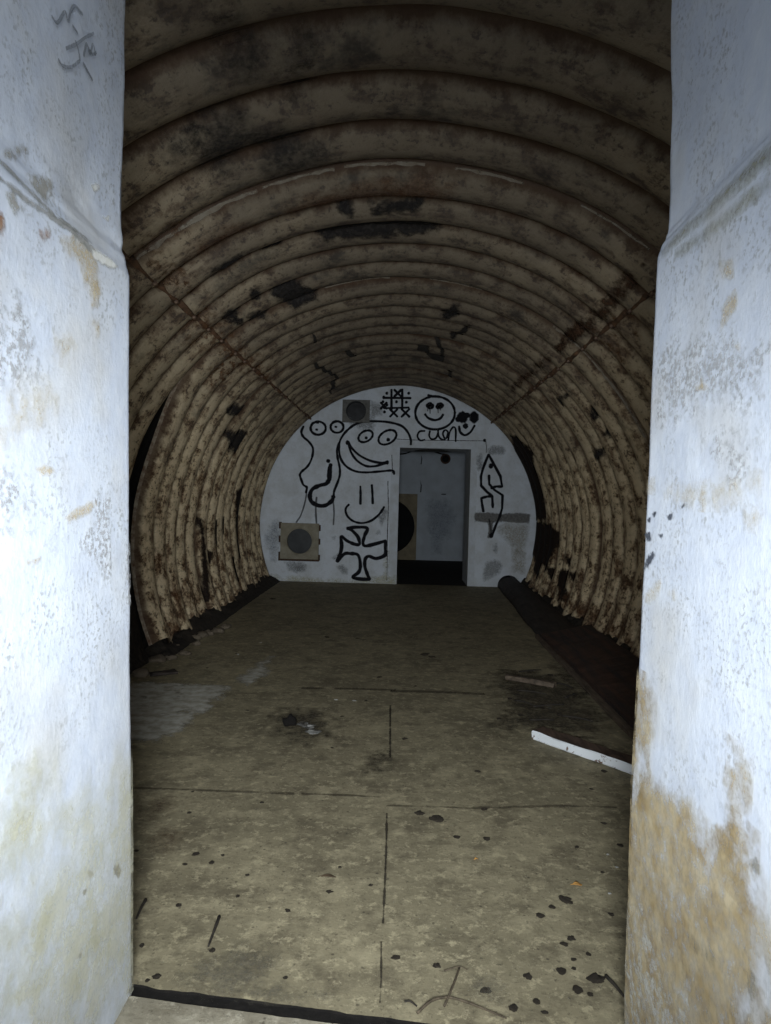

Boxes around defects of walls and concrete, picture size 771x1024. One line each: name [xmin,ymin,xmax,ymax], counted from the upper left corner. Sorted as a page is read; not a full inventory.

peeling [136,161,425,260]
peeling [456,168,523,184]
damp [632,679,650,766]
damp [624,781,771,1024]